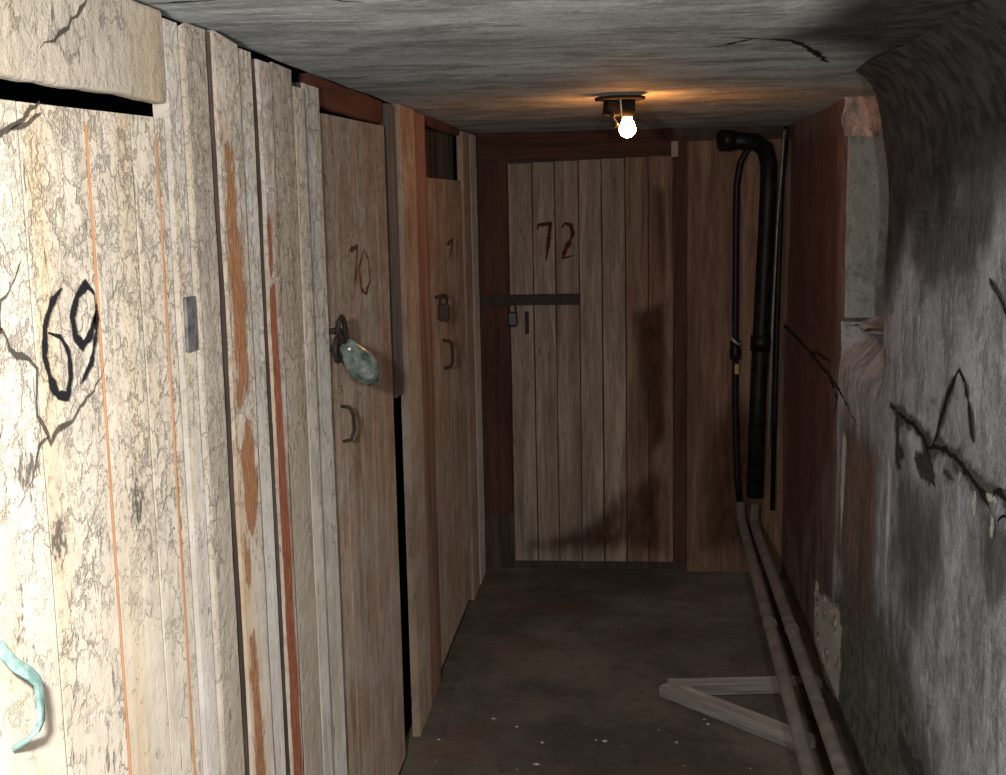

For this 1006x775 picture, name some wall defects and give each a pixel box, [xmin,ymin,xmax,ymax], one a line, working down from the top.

crack [40,0,87,48]
crack [688,37,829,63]
crack [0,101,41,137]
crack [989,278,1006,314]
crack [0,261,106,487]
crack [889,367,1006,522]